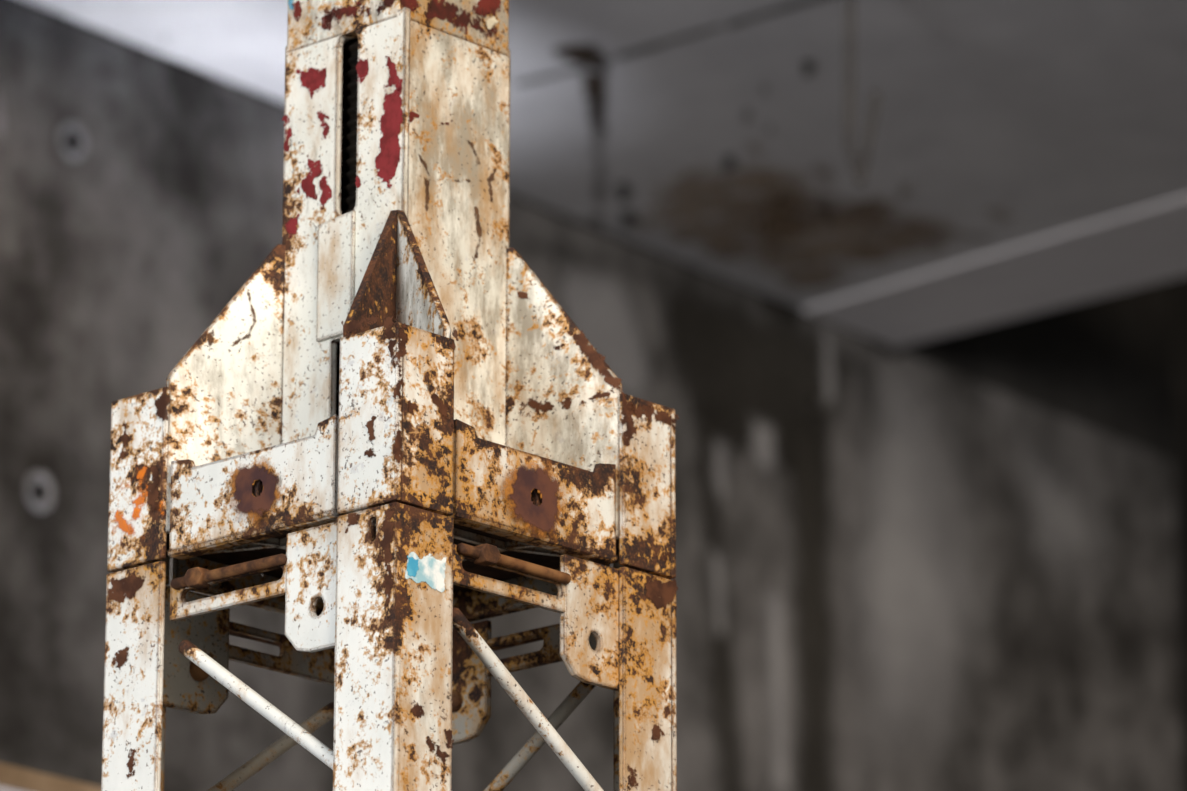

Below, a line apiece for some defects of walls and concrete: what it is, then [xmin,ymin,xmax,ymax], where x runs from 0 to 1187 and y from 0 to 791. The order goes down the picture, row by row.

peeling [315,0,501,40]
peeling [356,58,369,83]
peeling [296,67,330,139]
peeling [375,56,420,188]
peeling [297,158,332,210]
peeling [285,213,300,238]
rust [341,311,417,415]
rust [521,330,679,446]
rust [364,416,376,457]
rust [227,457,280,524]
rust [107,574,144,603]
rust [112,647,131,673]